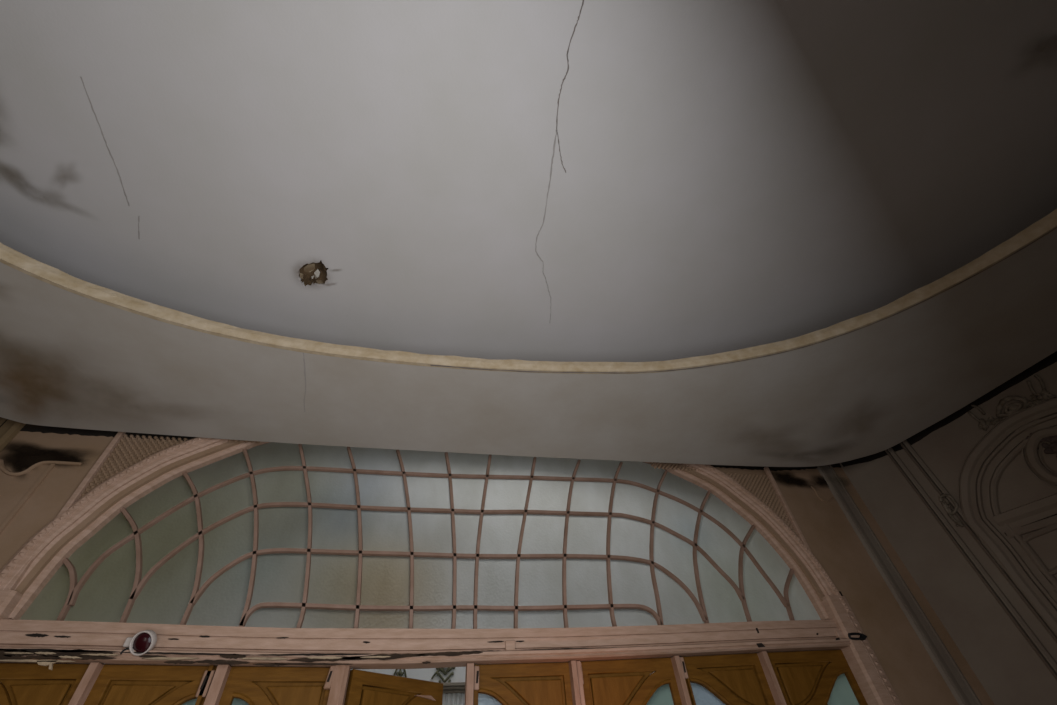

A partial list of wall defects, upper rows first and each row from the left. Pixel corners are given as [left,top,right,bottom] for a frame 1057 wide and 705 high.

spalling [299,261,328,286]
crack [535,0,584,320]